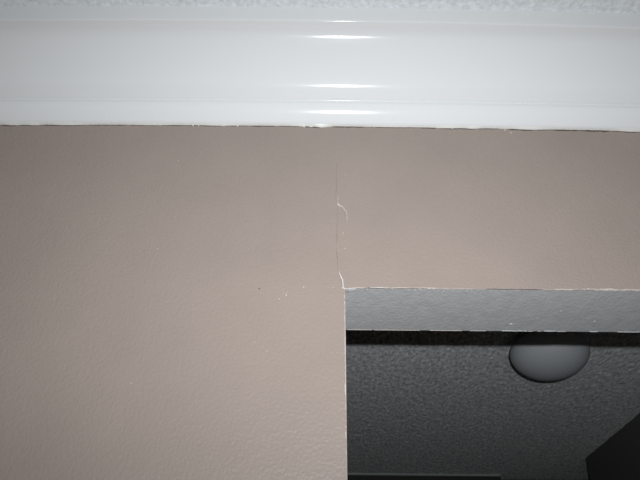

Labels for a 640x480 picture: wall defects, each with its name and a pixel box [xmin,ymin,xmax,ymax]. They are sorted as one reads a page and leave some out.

crack [336,167,348,287]